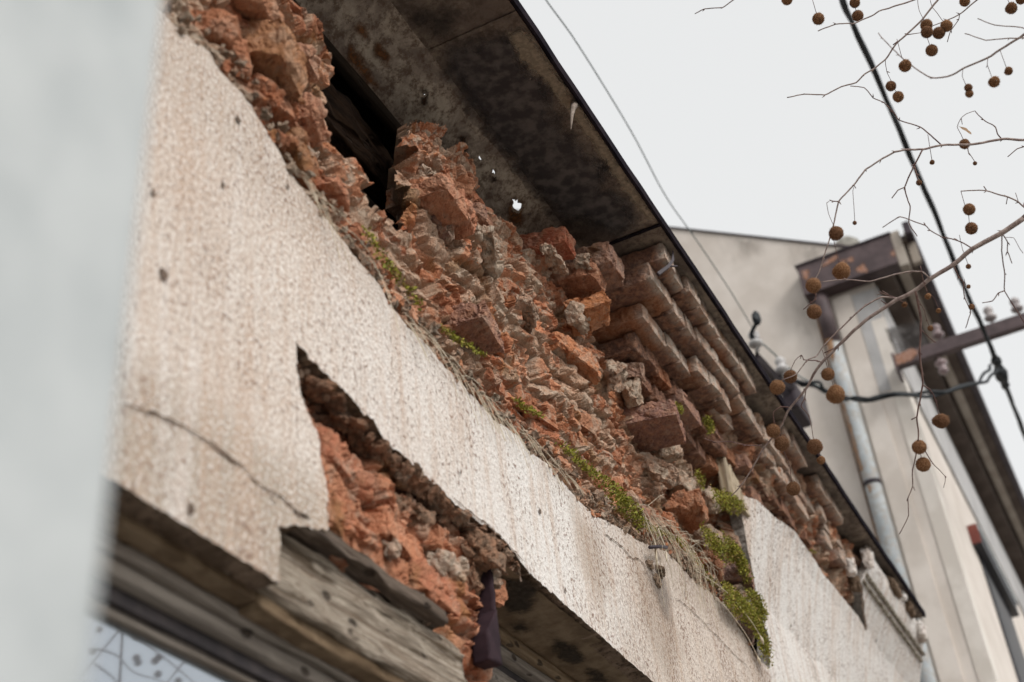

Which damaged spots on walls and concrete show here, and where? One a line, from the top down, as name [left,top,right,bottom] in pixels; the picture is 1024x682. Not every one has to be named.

leakage [448,32,656,235]
flaking render [162,0,862,682]
crack [122,403,303,519]